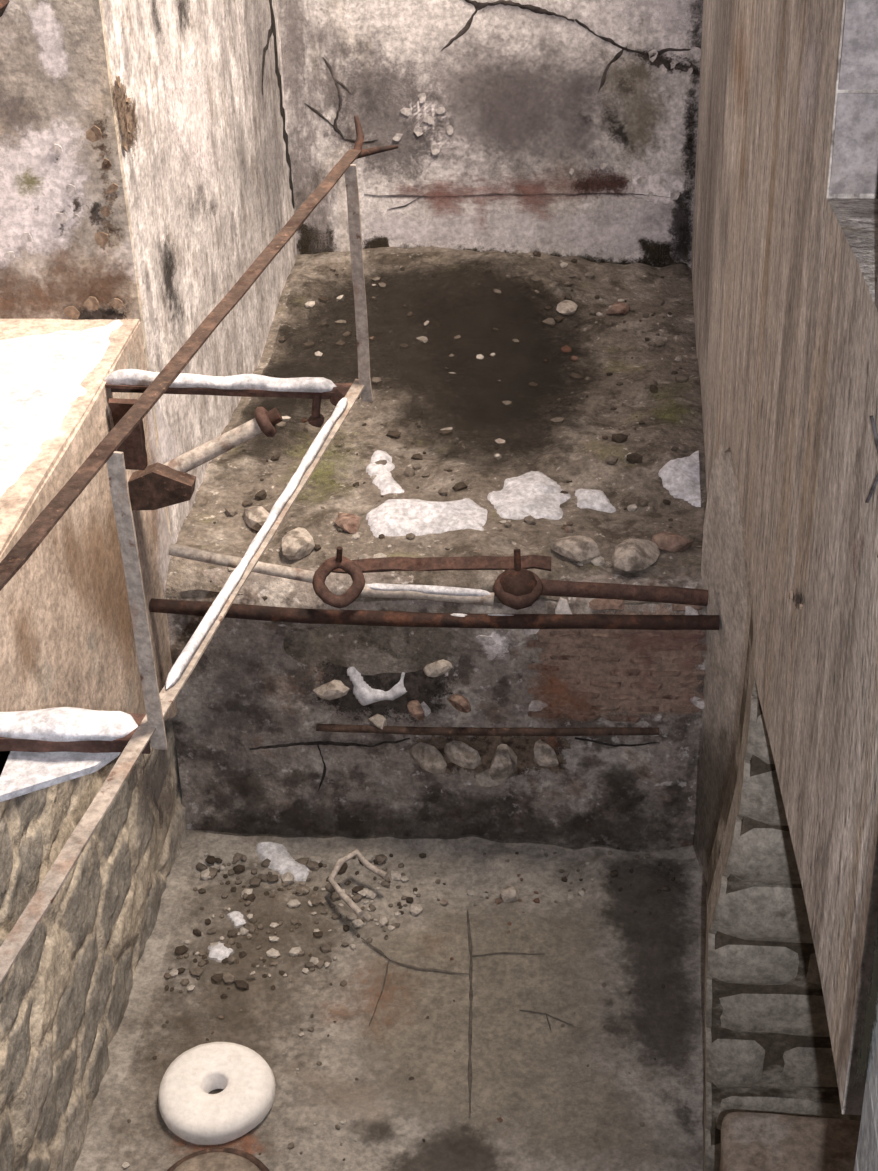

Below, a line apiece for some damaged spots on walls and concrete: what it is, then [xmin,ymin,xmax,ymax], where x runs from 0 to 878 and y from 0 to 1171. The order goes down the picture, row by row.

crack [441,0,700,93]
crack [262,0,376,208]
damp [605,112,633,149]
corrosion [332,555,551,574]
damp [204,769,699,1068]